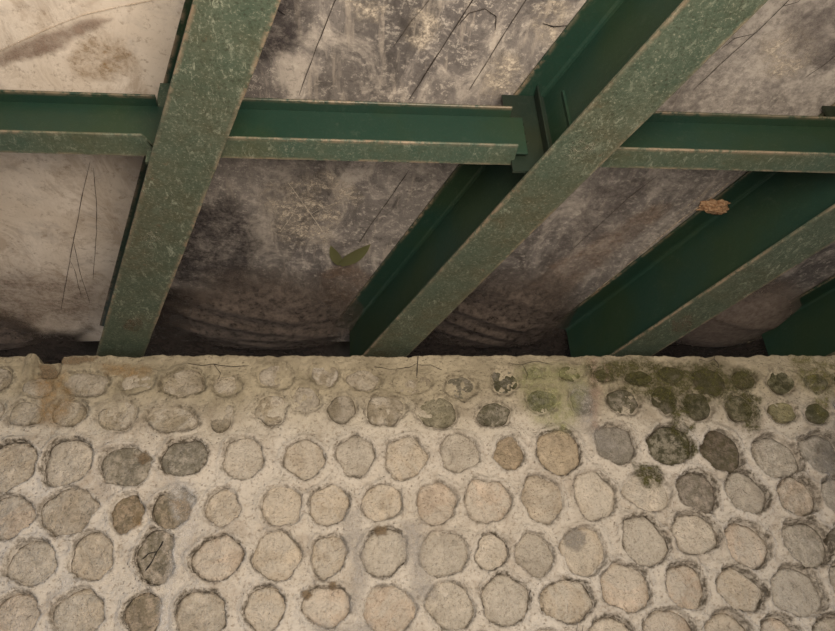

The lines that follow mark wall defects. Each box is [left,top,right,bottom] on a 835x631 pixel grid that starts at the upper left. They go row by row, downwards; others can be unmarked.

crack [299,0,336,95]
crack [410,0,526,98]
crack [702,0,800,82]
crack [61,163,97,308]
peeling [597,181,728,290]
leakage [741,394,762,431]
crack [143,541,164,571]